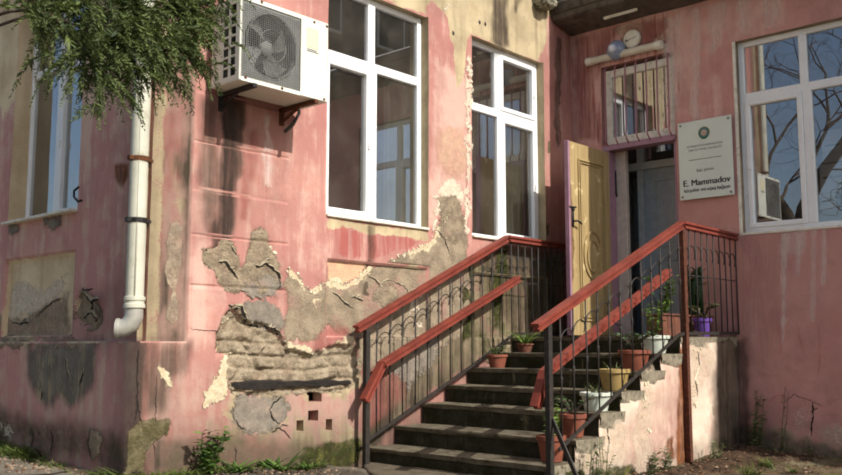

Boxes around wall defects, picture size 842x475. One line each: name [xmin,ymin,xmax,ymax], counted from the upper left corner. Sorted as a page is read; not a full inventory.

water stain [493,0,517,48]
water stain [208,95,253,246]
peeling [202,56,474,397]
flaking render [0,288,103,350]
flaking render [157,366,173,387]
water stain [0,343,176,475]
crack [785,394,823,436]